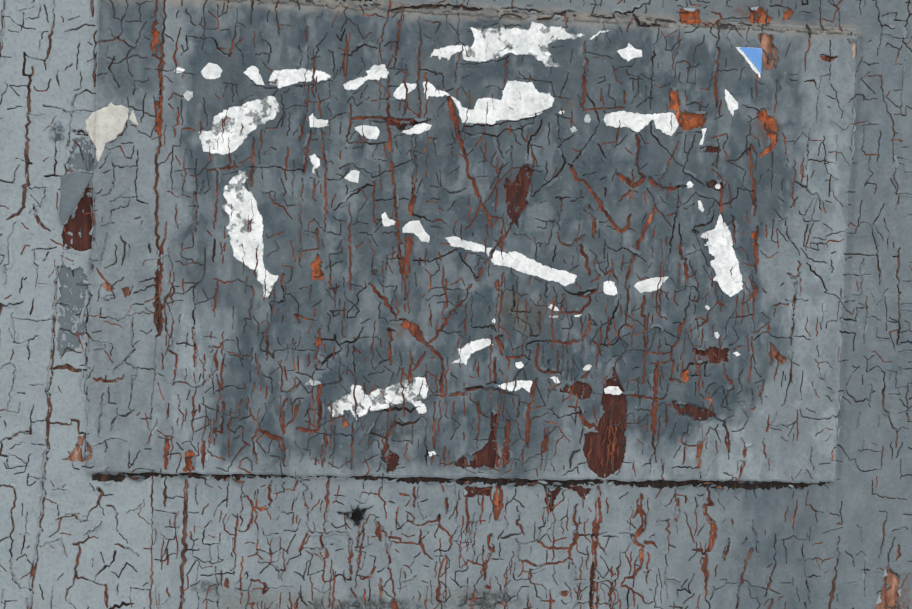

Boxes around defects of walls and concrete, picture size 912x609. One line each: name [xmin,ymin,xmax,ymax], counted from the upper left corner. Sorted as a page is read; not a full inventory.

crack [468,0,573,63]
peeling [749,6,779,70]
crack [0,0,79,231]
peeling [669,87,707,131]
peeling [757,109,778,157]
crack [790,0,912,204]
peeling [57,103,138,356]
peeling [504,164,532,228]
crack [844,201,912,351]
peeling [583,366,628,478]
crack [812,349,912,500]
crack [65,521,137,609]